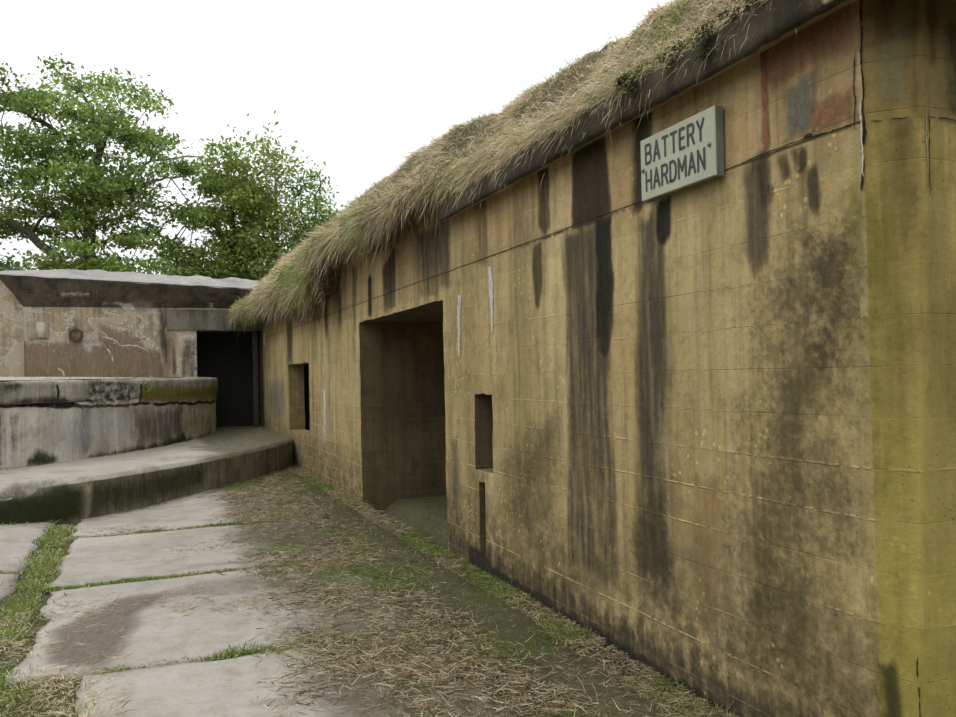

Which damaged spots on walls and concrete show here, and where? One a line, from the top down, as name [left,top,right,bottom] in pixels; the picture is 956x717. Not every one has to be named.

leakage [532,167,549,306]
leakage [633,112,651,211]
leakage [747,155,770,264]
leakage [780,148,818,210]
crack [731,0,956,195]
peeling [22,318,162,405]
leakage [564,137,615,579]
leakage [632,197,672,595]